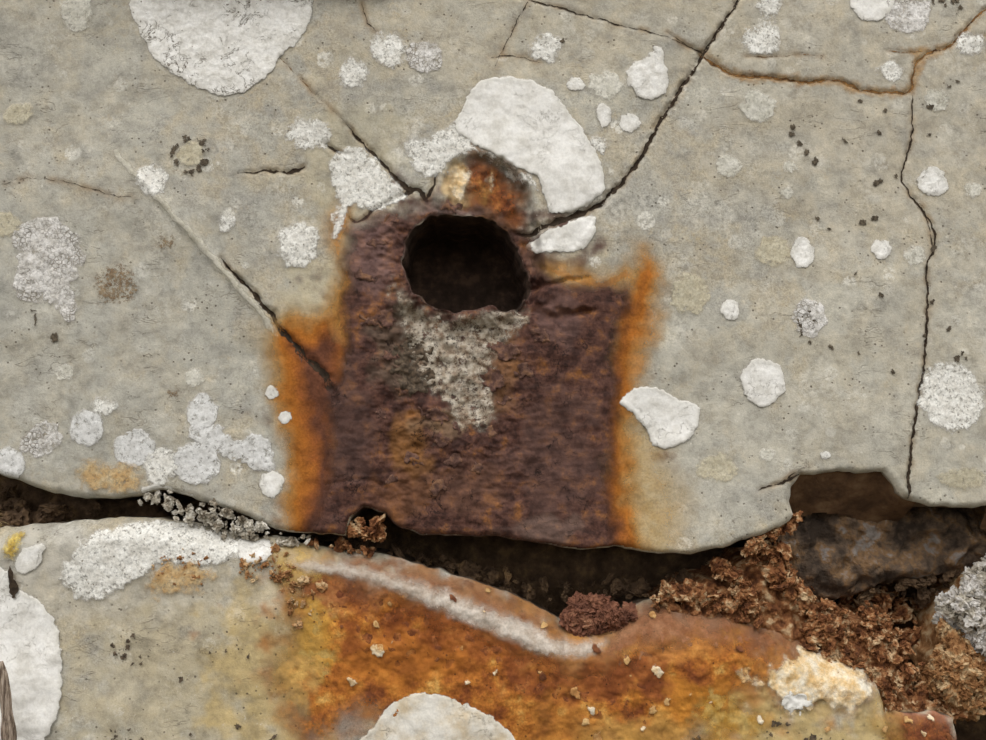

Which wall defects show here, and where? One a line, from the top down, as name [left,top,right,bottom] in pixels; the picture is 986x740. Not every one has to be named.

crack [241,166,305,174]
crack [325,125,436,223]
crack [491,0,986,499]
crack [221,258,333,391]
rust [271,161,669,551]
spalling [789,471,916,524]
rust [273,551,805,740]
spalling [737,645,872,716]
rust [900,714,953,740]